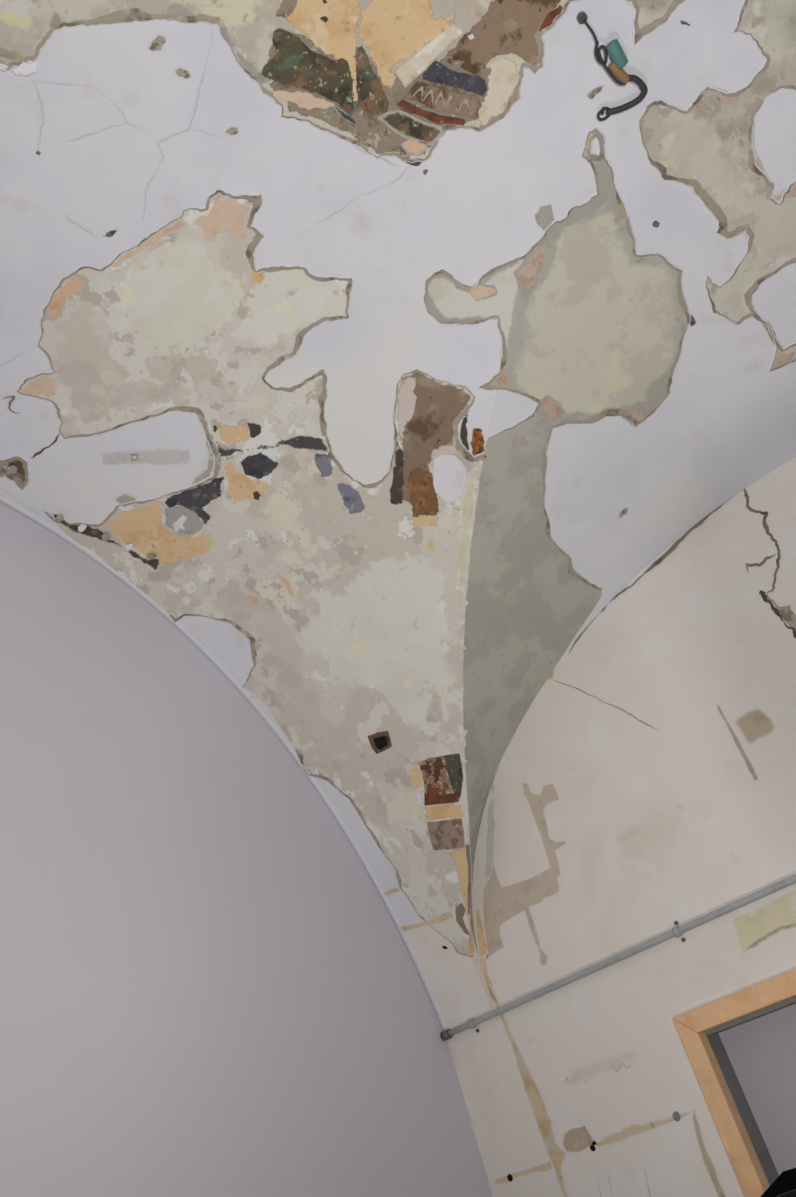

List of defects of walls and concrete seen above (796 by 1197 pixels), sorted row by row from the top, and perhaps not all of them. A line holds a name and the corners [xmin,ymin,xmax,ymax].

crack [29,27,223,222]
flaking render [0,0,581,176]
flaking render [584,84,605,101]
flaking render [624,0,692,45]
flaking render [637,0,796,372]
flaking render [0,455,30,490]
flaking render [15,126,697,957]
crack [569,489,796,654]
crack [552,679,657,730]
flaking render [731,888,796,955]